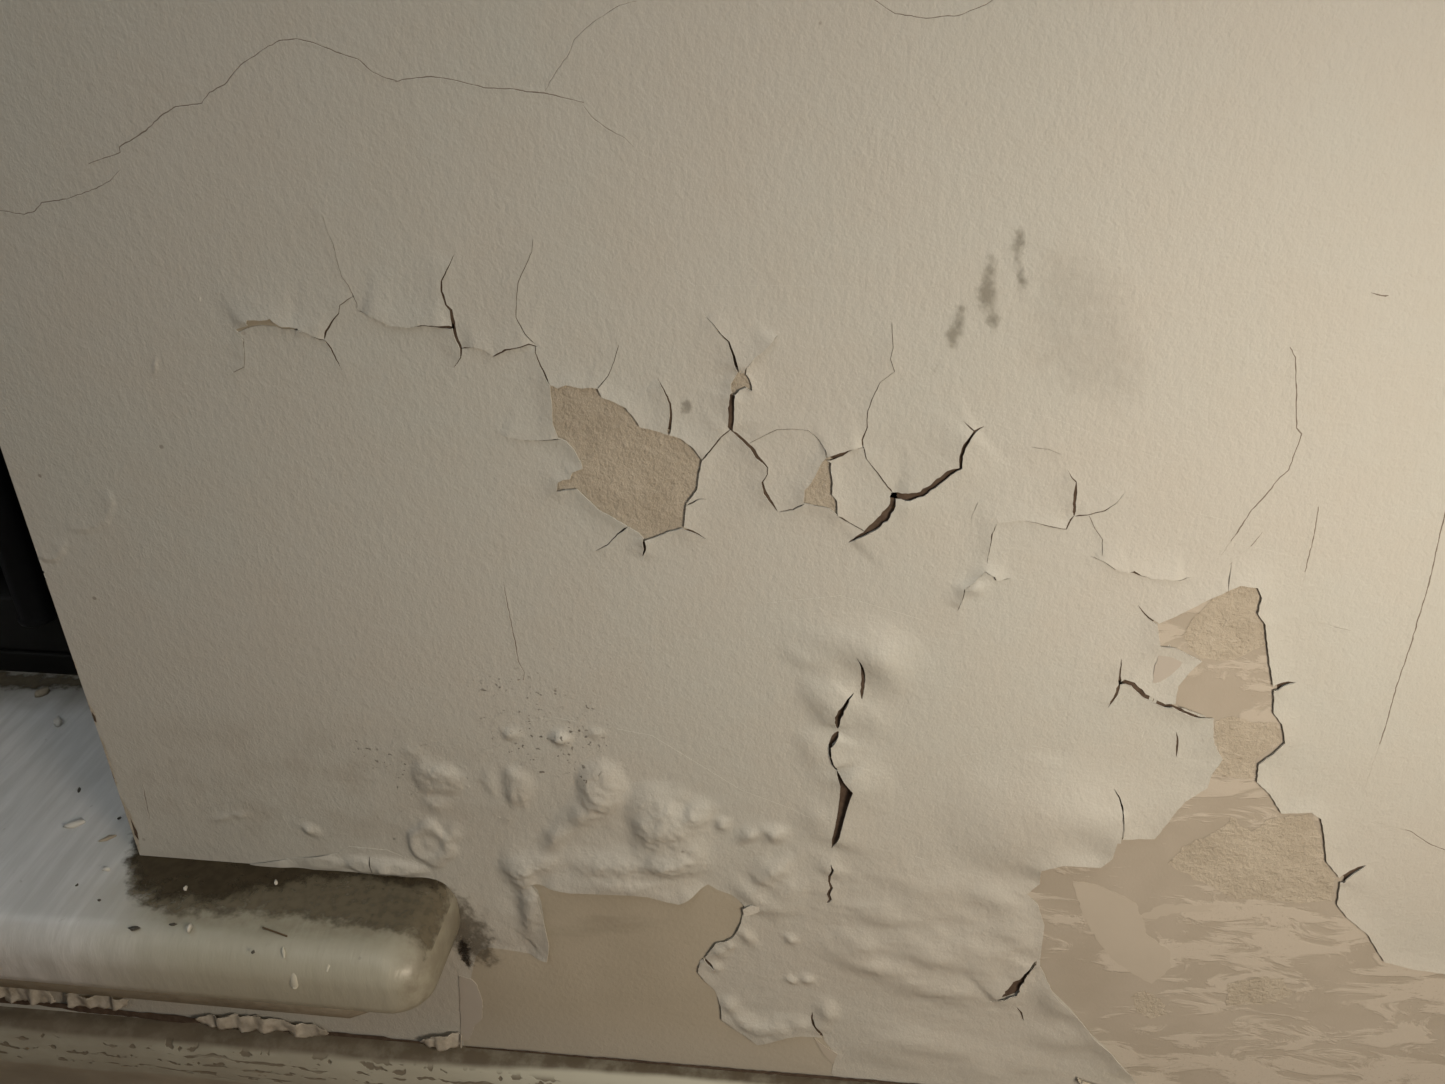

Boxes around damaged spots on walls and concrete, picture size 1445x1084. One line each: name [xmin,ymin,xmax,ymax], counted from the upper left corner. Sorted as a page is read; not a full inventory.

crack [0,0,637,219]
crack [863,0,1000,24]
spalling [195,185,757,602]
crack [642,246,1171,602]
crack [1215,347,1306,566]
crack [1299,507,1351,632]
crack [1360,486,1445,854]
spalling [987,507,1445,1084]
peeling [0,987,128,1011]
peeling [195,1013,329,1038]
peeling [420,1032,462,1052]